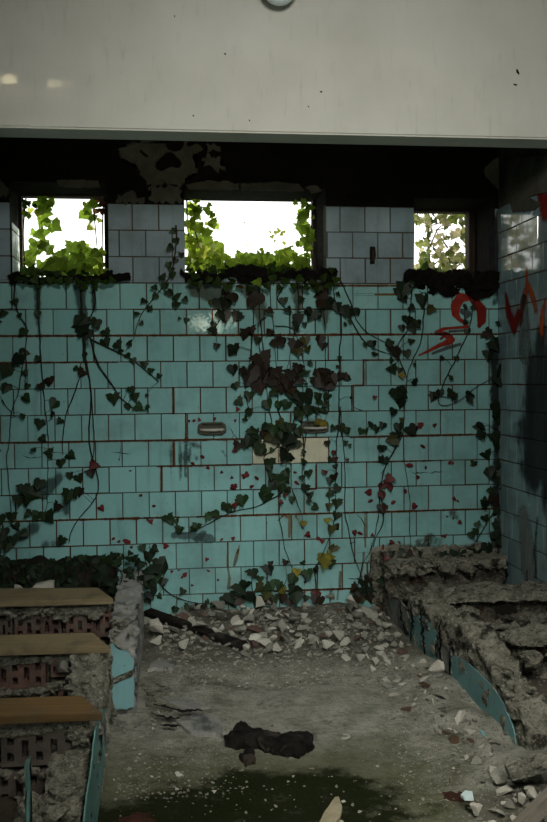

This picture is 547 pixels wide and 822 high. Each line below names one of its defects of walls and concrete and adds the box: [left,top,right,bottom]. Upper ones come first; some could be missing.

flaking render [115,140,322,205]
leakage [488,217,499,271]
leakage [488,347,499,404]
spalling [368,542,497,638]
flaking render [113,598,140,702]
flaking render [437,642,453,676]